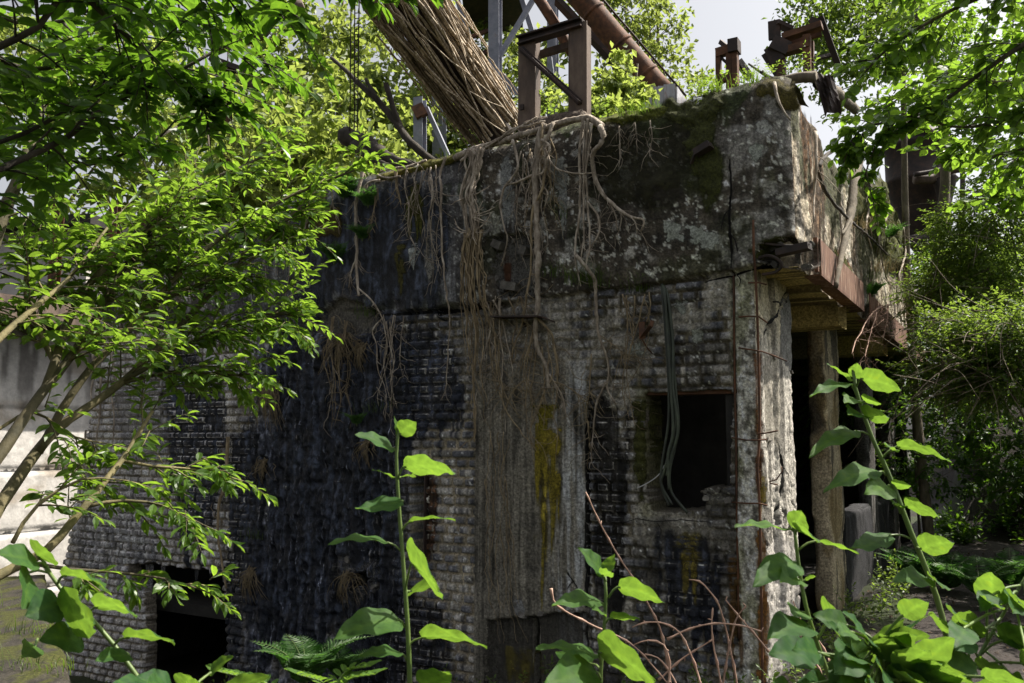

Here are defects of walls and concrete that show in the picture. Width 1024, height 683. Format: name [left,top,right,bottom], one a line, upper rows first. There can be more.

crack [705,159,770,286]
rust [753,353,764,489]
water stain [535,404,561,610]
rust [755,530,767,569]
rust [756,585,770,683]